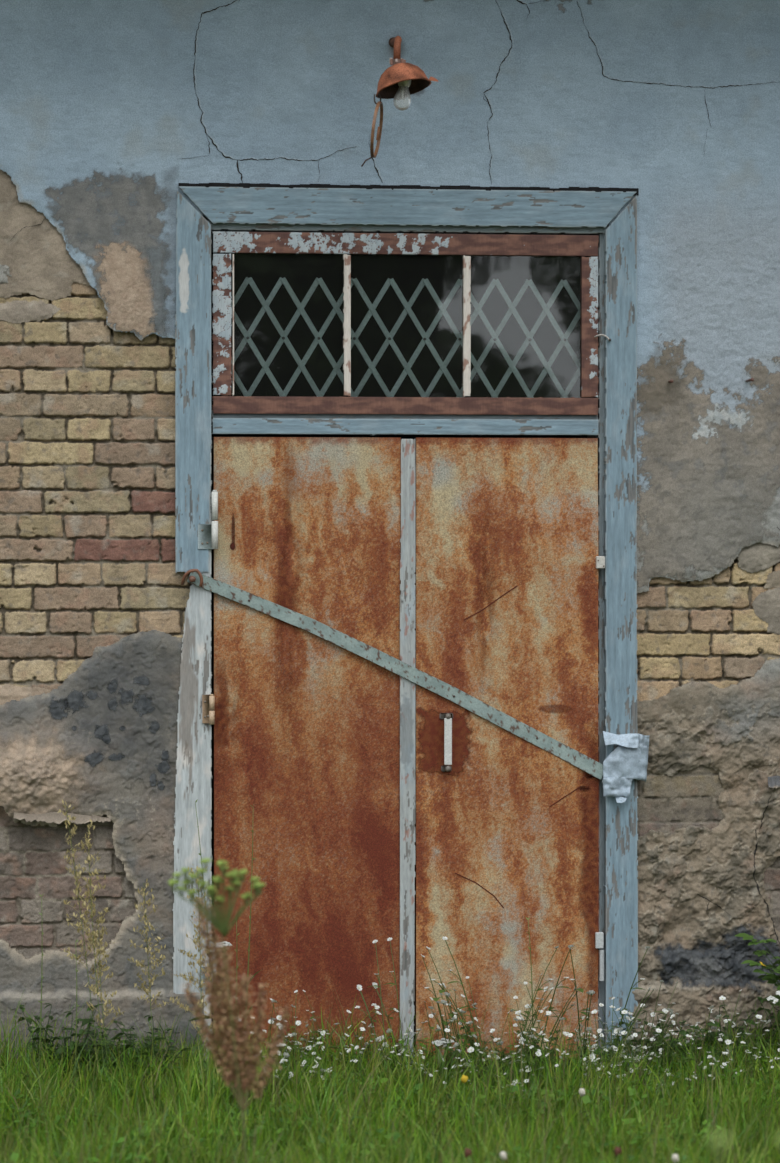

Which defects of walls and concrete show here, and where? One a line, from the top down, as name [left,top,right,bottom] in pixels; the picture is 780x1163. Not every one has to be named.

crack [182,0,384,183]
crack [483,0,540,184]
crack [577,0,778,147]
flaking render [0,170,192,705]
corrosion [280,565,294,624]
peeling [637,339,780,701]
corrosion [214,684,228,745]
corrosion [416,707,472,776]
flaking render [0,806,138,962]
corrosion [580,774,599,987]
crack [753,795,780,944]